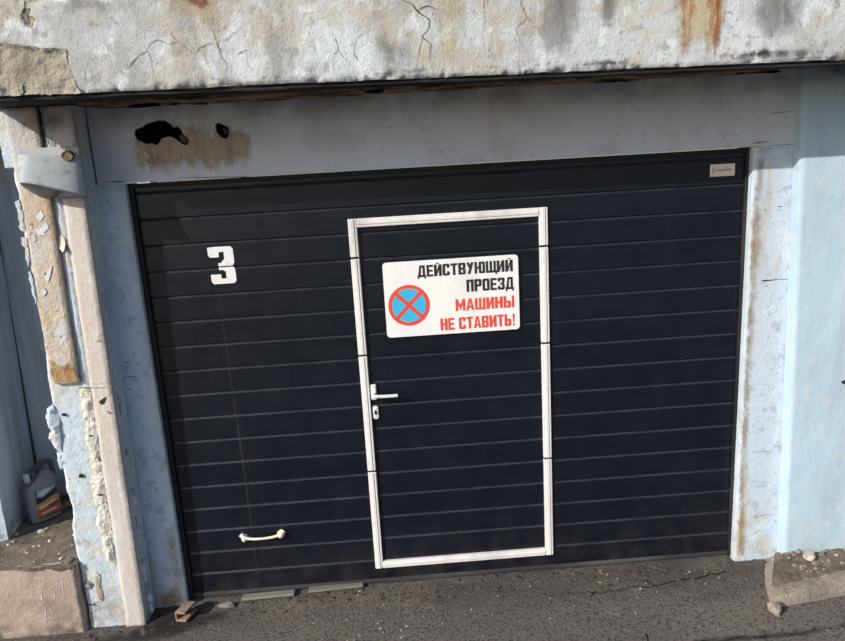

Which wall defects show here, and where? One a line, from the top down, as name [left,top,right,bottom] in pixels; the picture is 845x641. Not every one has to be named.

spalling [20,8,34,27]
spalling [0,43,82,96]
crack [128,19,253,85]
crack [403,0,440,69]
water stain [544,0,570,44]
water stain [604,0,614,17]
corrosion [681,0,723,48]
water stain [759,0,796,30]
peeling [15,200,52,304]